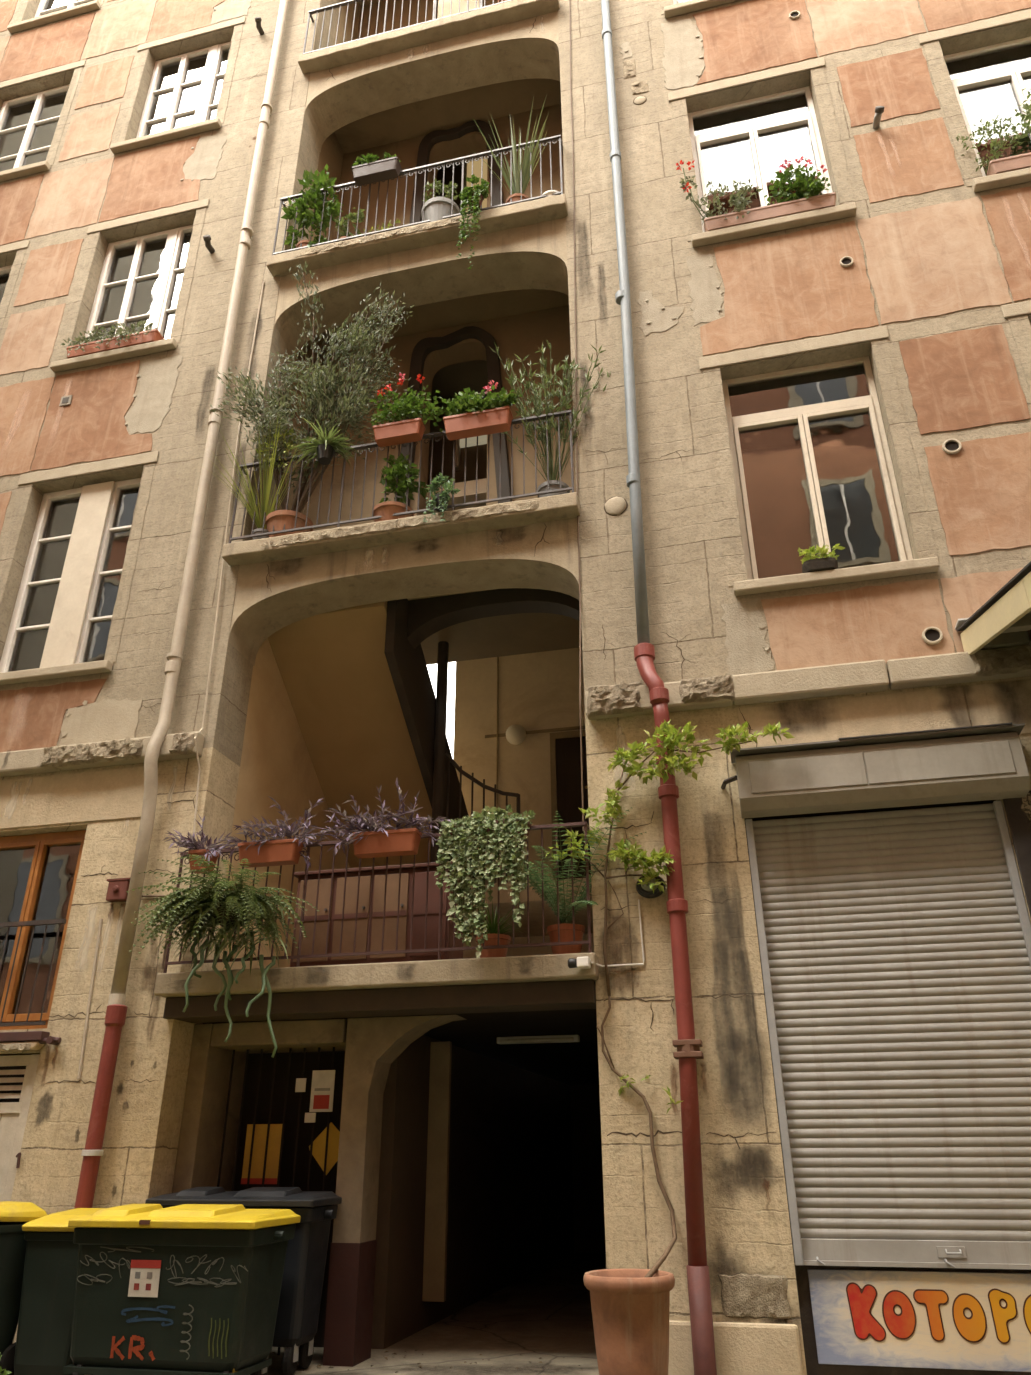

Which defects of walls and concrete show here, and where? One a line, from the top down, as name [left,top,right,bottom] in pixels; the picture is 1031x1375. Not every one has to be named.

peeling [620,18,705,95]
peeling [125,355,182,435]
damp [708,841,754,1051]
crack [604,994,759,1029]
crack [607,1130,775,1149]